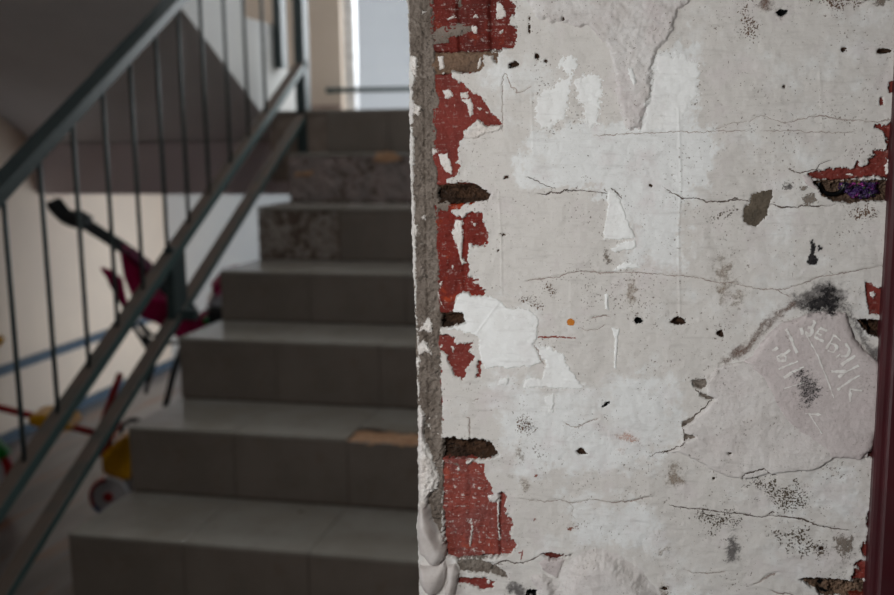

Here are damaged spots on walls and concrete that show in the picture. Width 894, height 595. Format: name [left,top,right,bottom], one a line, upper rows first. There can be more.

peeling [534,55,604,131]
peeling [638,51,701,135]
crack [597,115,891,136]
flaking render [808,123,890,180]
crack [529,177,622,199]
crack [662,186,750,203]
crack [773,202,835,210]
flaking render [348,0,583,589]
crack [528,265,882,296]
crack [652,379,712,456]
crack [521,497,646,519]
crack [670,505,844,530]